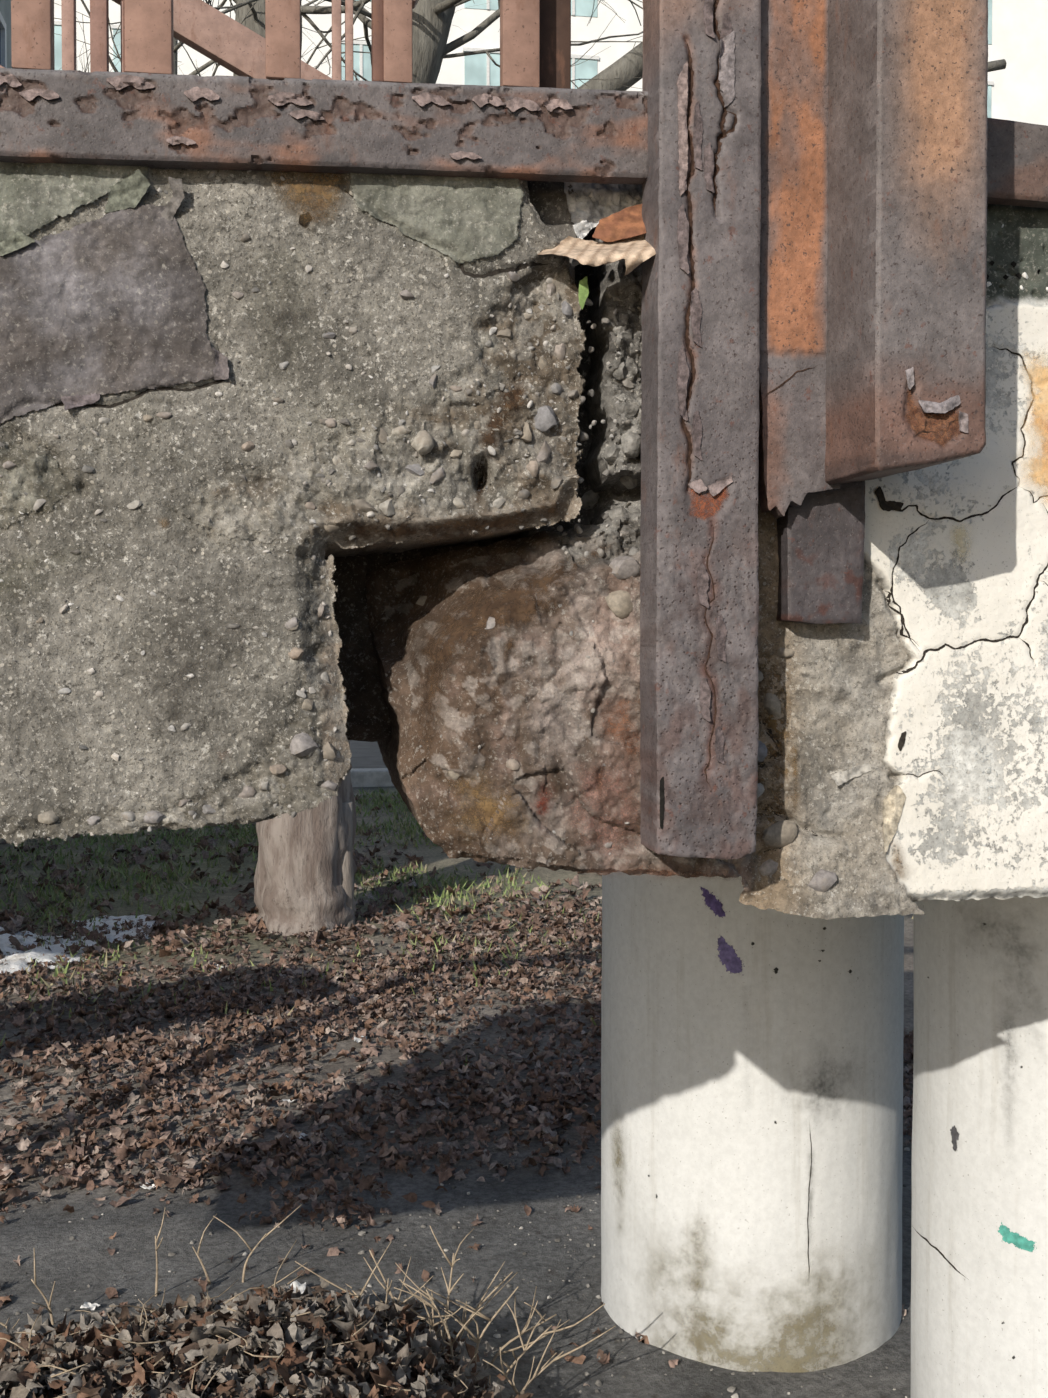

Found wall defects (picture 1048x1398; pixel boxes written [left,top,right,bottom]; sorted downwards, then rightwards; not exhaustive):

peeling [0,72,60,102]
peeling [267,92,325,121]
peeling [412,92,451,107]
peeling [472,94,573,112]
crack [681,0,737,487]
rust [906,390,959,446]
peeling [905,367,968,433]
rust [1028,365,1048,487]
rust [690,487,727,519]
crack [880,347,1048,680]
spalling [0,259,925,930]
crack [805,1122,813,1270]